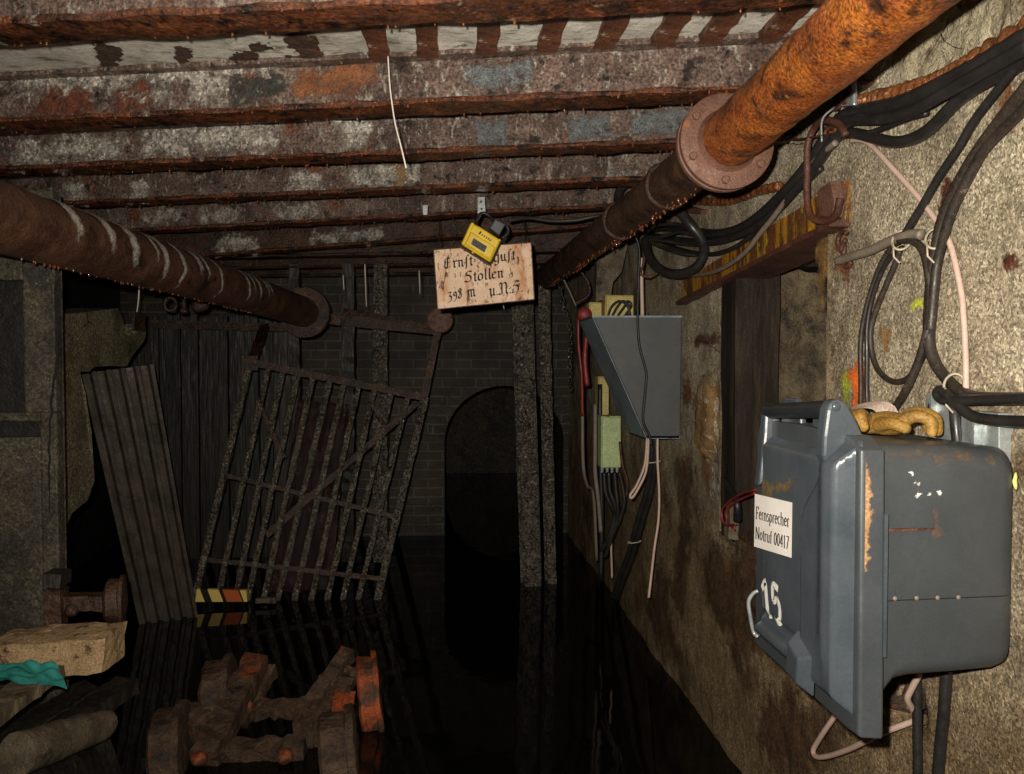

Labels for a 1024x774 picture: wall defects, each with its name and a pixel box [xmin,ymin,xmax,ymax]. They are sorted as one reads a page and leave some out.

corrosion [31,78,95,122]
corrosion [104,77,154,120]
corrosion [291,63,377,120]
corrosion [549,151,696,287]
corrosion [20,257,252,314]
water stain [647,458,697,664]
water stain [704,530,762,689]